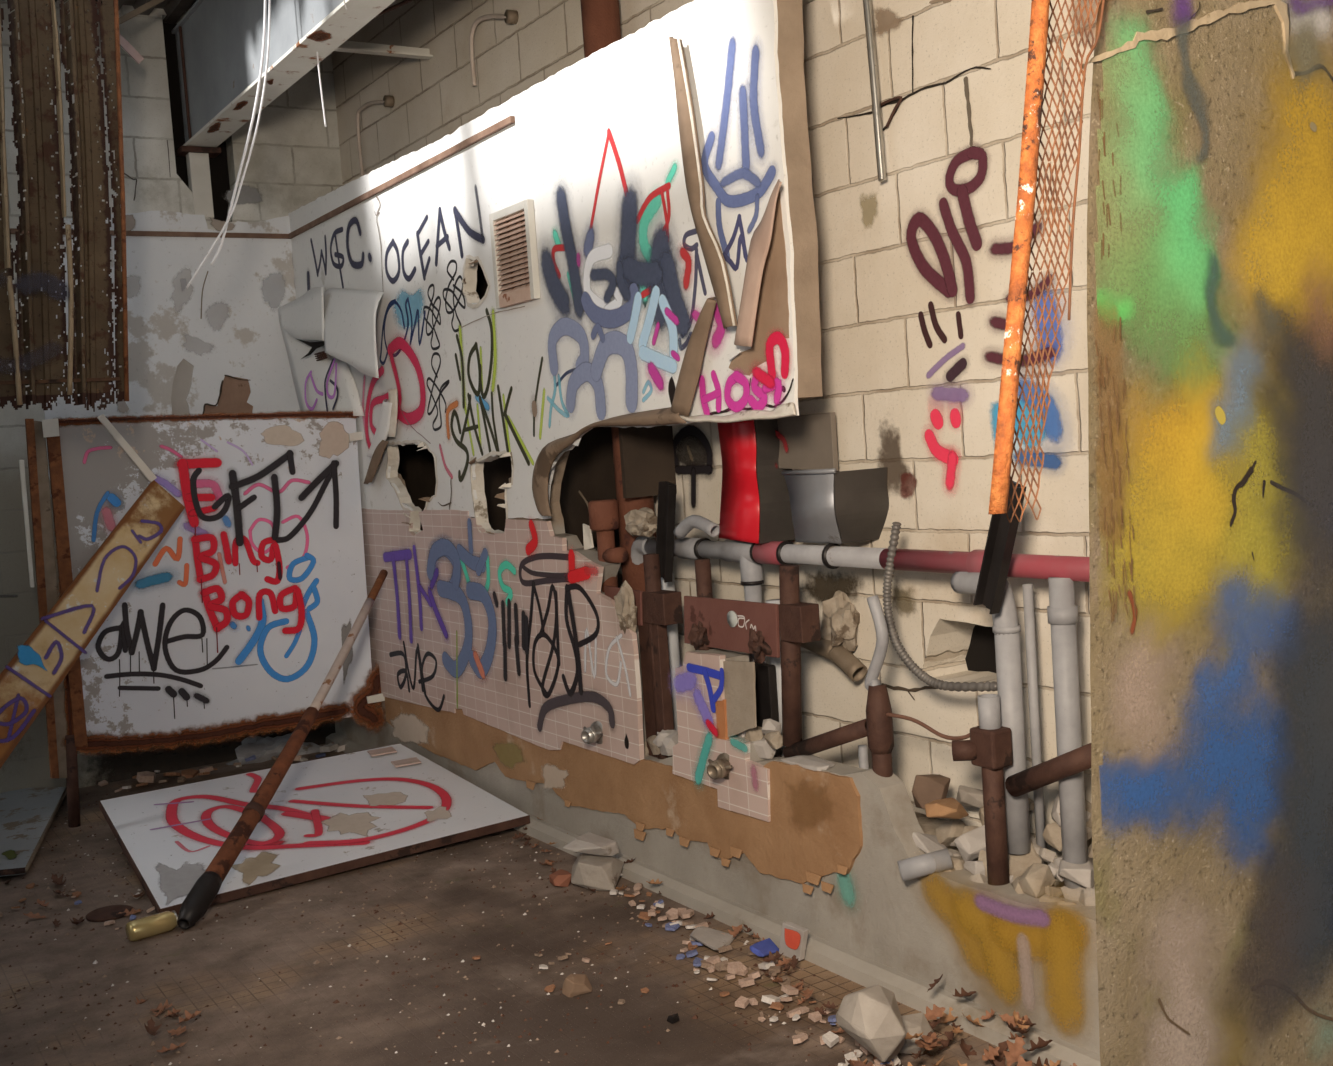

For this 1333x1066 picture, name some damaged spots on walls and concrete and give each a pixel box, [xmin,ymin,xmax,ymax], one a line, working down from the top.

crack [1146,1,1200,20]
rust [306,30,331,41]
crack [1287,3,1333,81]
crack [837,0,991,147]
peeling [227,185,262,204]
peeling [321,792,408,837]
spalling [385,697,863,895]
peeling [156,863,206,904]
peeling [232,852,280,885]